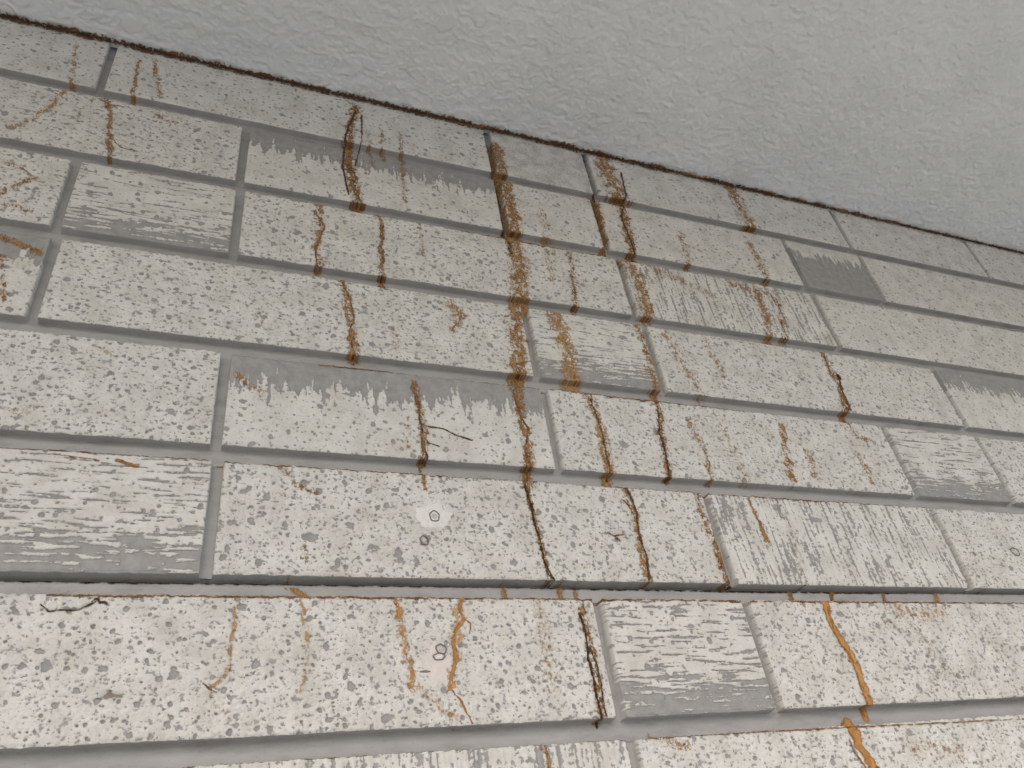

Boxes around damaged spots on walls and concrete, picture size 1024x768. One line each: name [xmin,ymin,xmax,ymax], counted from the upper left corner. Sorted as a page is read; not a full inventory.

corrosion [341,103,408,289]
crack [0,12,1024,254]
corrosion [0,447,238,468]
corrosion [46,134,1024,768]